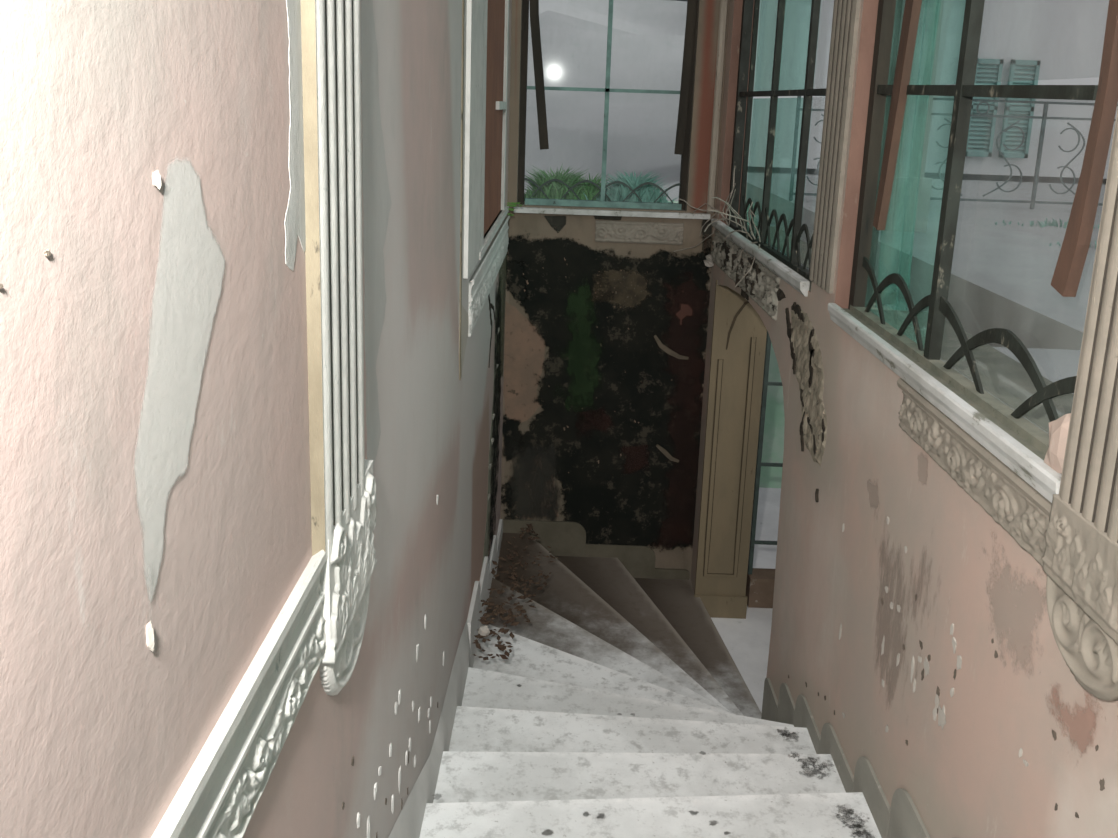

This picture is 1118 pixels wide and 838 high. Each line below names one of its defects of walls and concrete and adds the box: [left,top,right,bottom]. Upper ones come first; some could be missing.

peeling [284,0,306,271]
peeling [134,159,225,601]
water stain [488,216,712,560]
flaking render [775,288,827,467]
peeling [357,812,378,838]
peeling [374,737,416,814]
peeling [395,689,438,733]